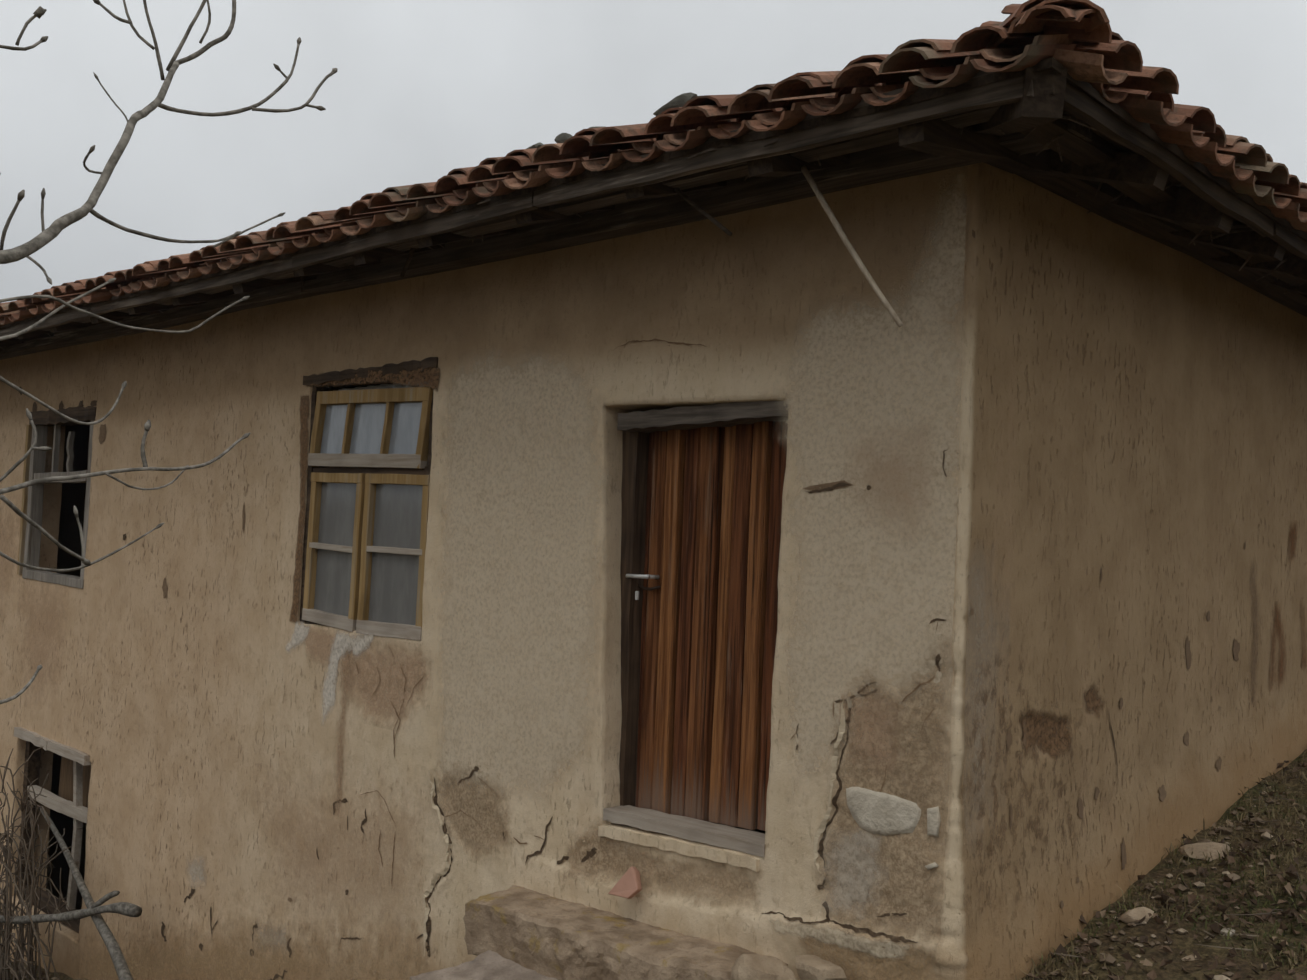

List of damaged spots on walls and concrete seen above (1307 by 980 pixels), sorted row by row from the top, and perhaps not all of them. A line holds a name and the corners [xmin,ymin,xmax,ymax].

leakage [286,623,309,650]
leakage [323,633,373,792]
crack [333,791,396,884]
crack [417,769,597,957]
crack [762,618,946,943]
spalling [823,664,949,936]